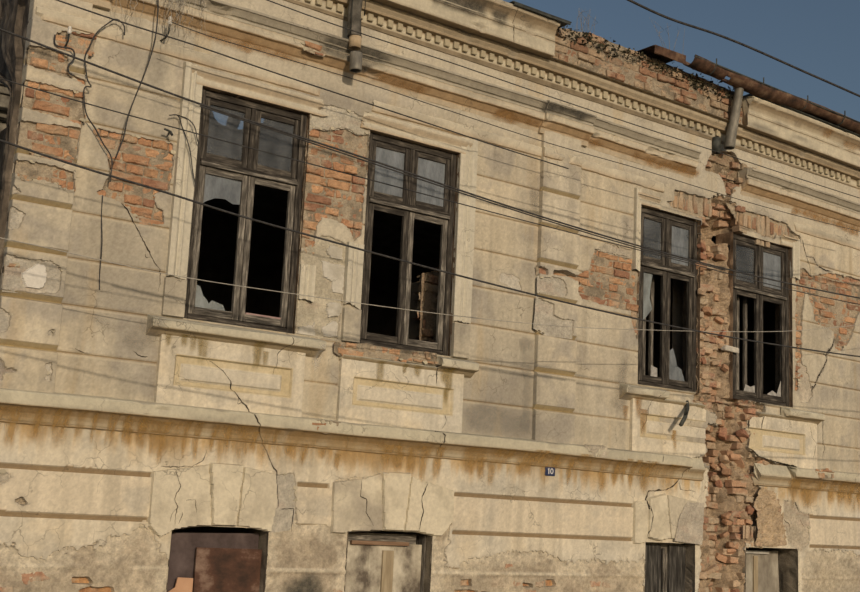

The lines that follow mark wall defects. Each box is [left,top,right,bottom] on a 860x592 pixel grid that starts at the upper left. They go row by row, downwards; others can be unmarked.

flaking render [547,28,745,125]
flaking render [13,31,176,225]
flaking render [293,106,369,341]
flaking render [2,254,64,293]
flaking render [533,243,639,339]
flaking render [794,269,860,403]
flaking render [0,520,168,592]
crack [163,451,207,524]
crack [210,361,294,529]
flaking render [430,524,645,592]
flaking render [675,502,704,545]
spalling [753,487,811,551]